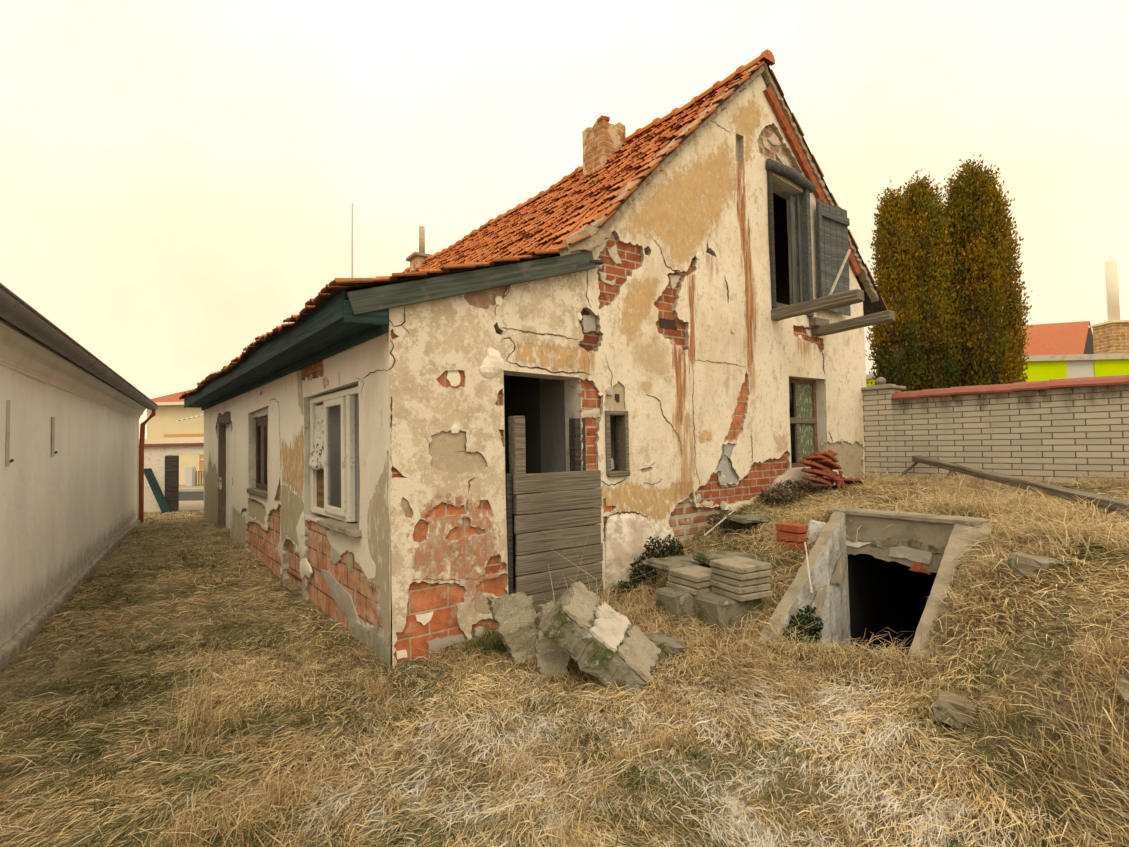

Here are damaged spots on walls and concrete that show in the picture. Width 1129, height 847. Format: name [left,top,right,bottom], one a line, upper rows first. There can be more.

peeling [596,101,804,350]
crack [495,286,612,393]
spalling [245,360,507,666]
peeling [516,341,620,470]
crack [605,511,647,524]
spalling [601,375,788,546]
crack [647,360,753,485]